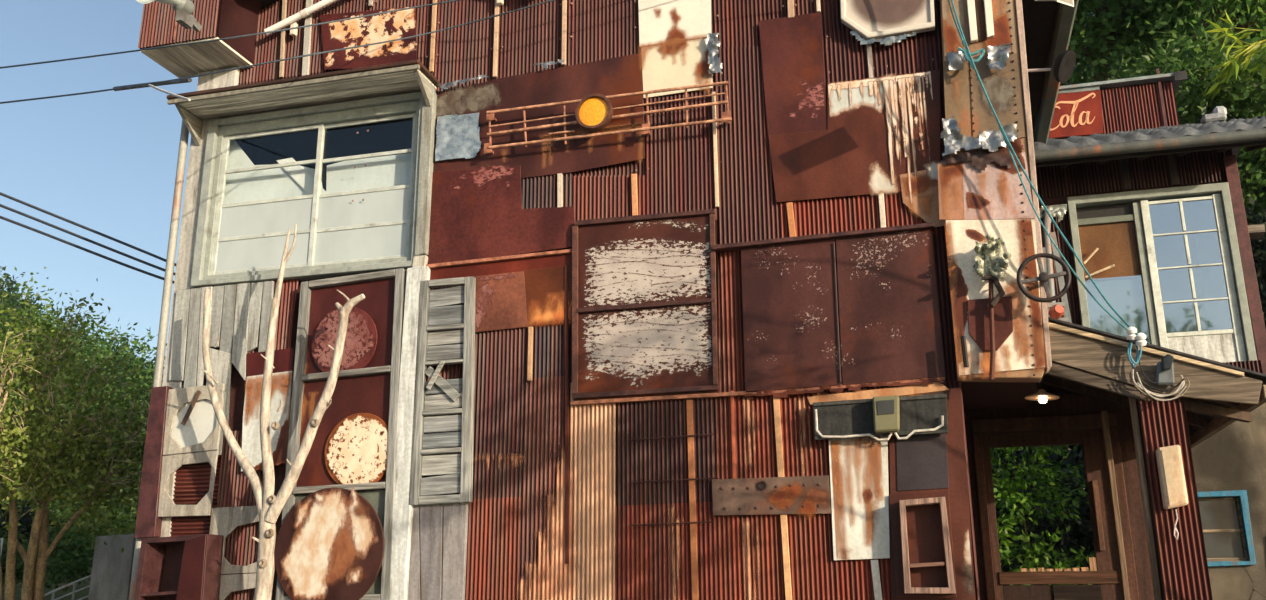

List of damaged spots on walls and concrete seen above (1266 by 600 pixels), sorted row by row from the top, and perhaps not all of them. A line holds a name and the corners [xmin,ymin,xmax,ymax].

peeling [325,6,417,67]
corrosion [641,10,710,91]
leakage [828,74,933,204]
corrosion [903,153,1026,215]
peeling [581,220,712,387]
corrosion [945,219,1047,379]
corrosion [743,378,945,560]
peeling [295,493,326,527]
peeling [348,488,377,556]
peeling [347,569,360,583]